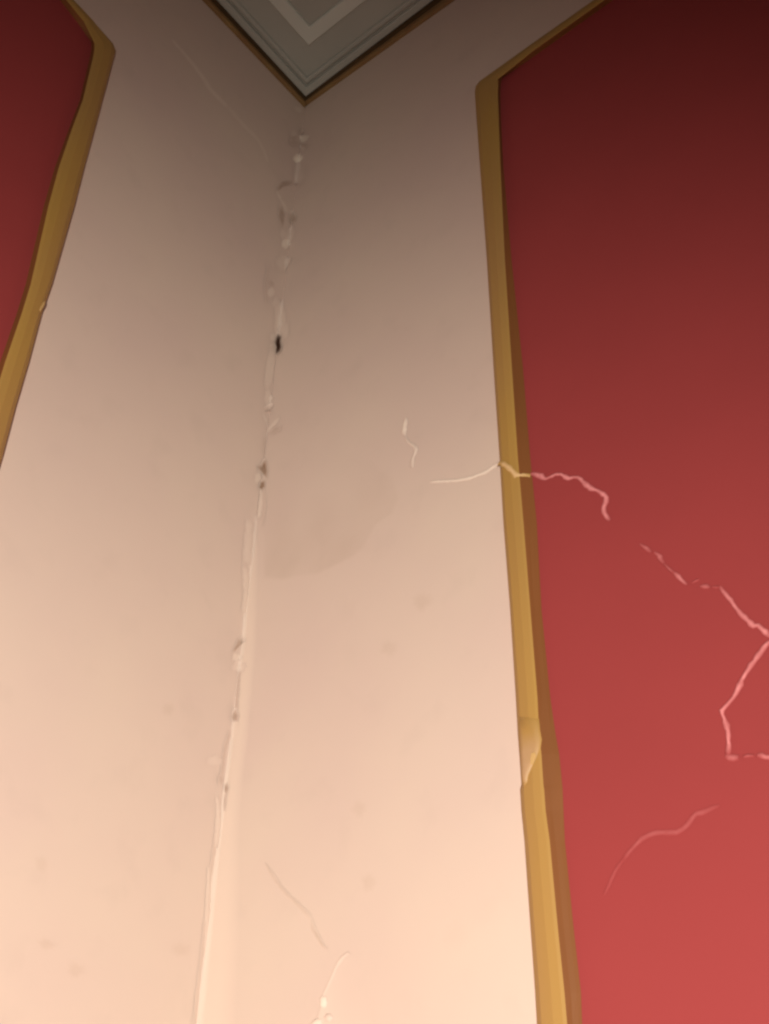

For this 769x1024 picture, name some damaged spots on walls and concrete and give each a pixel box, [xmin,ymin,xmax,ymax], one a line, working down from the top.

crack [401,418,611,522]
crack [192,106,311,1024]
crack [639,543,769,762]
peeling [519,717,542,786]
crack [603,804,720,895]